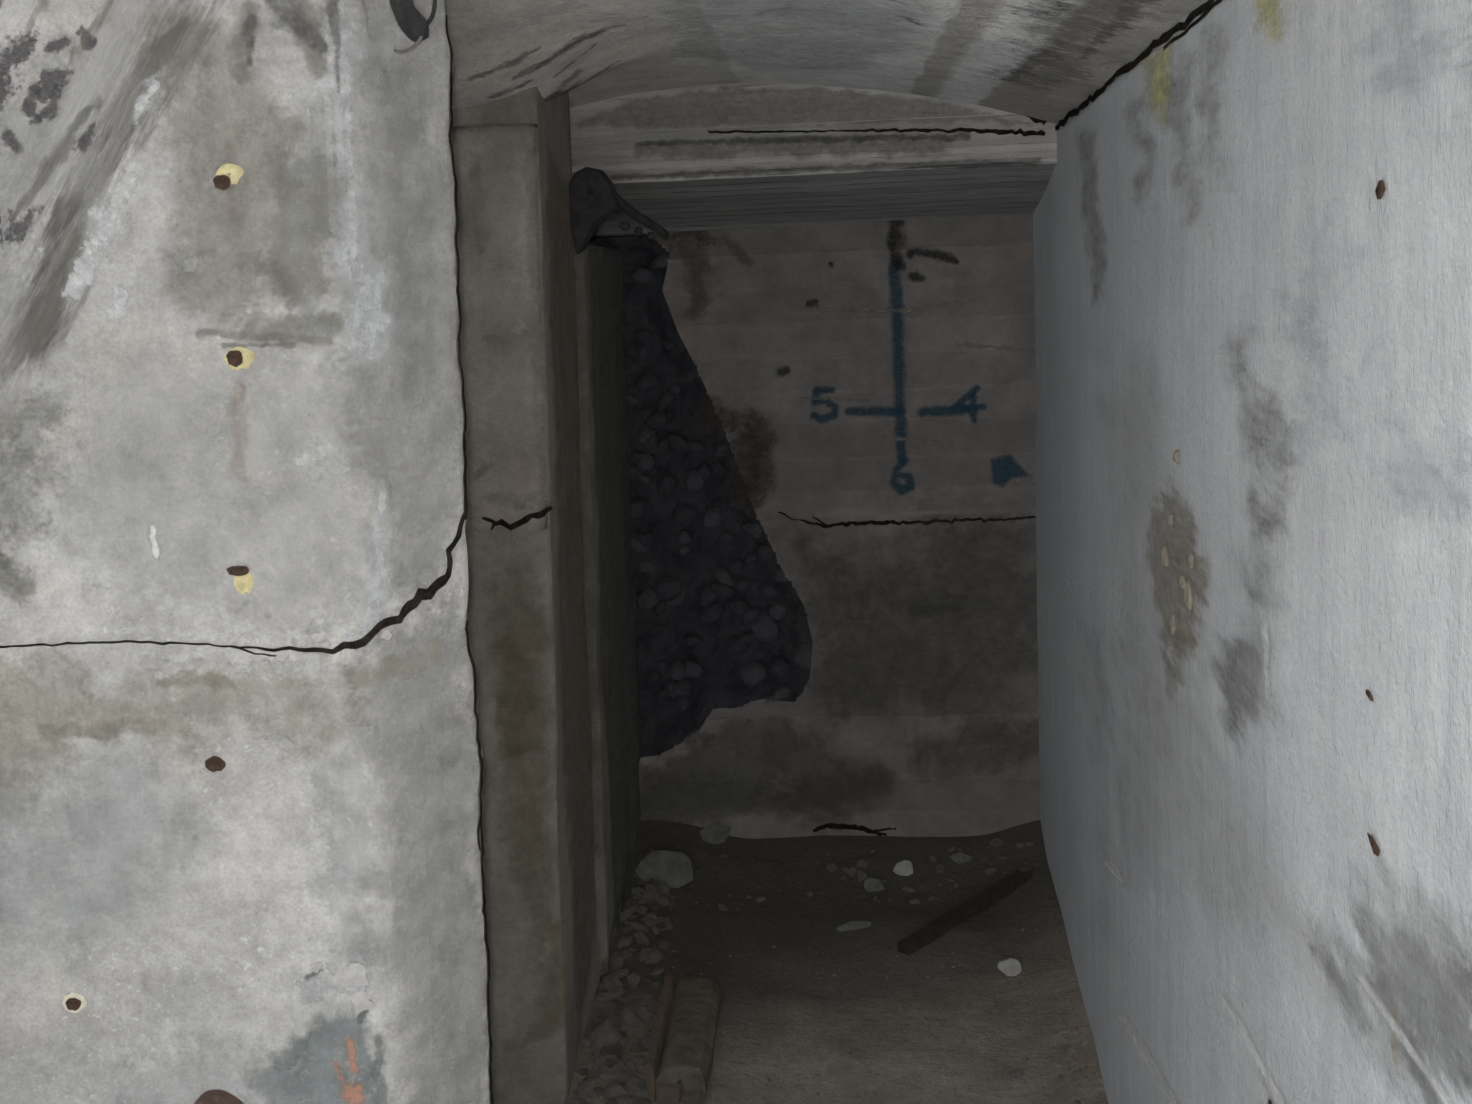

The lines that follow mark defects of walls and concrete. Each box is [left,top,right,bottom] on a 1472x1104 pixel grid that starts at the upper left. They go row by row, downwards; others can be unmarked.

water stain [0,0,463,617]
crack [0,15,553,663]
crack [778,512,1036,528]
crack [708,0,1222,137]
water stain [318,622,486,1104]
crack [465,620,493,1104]